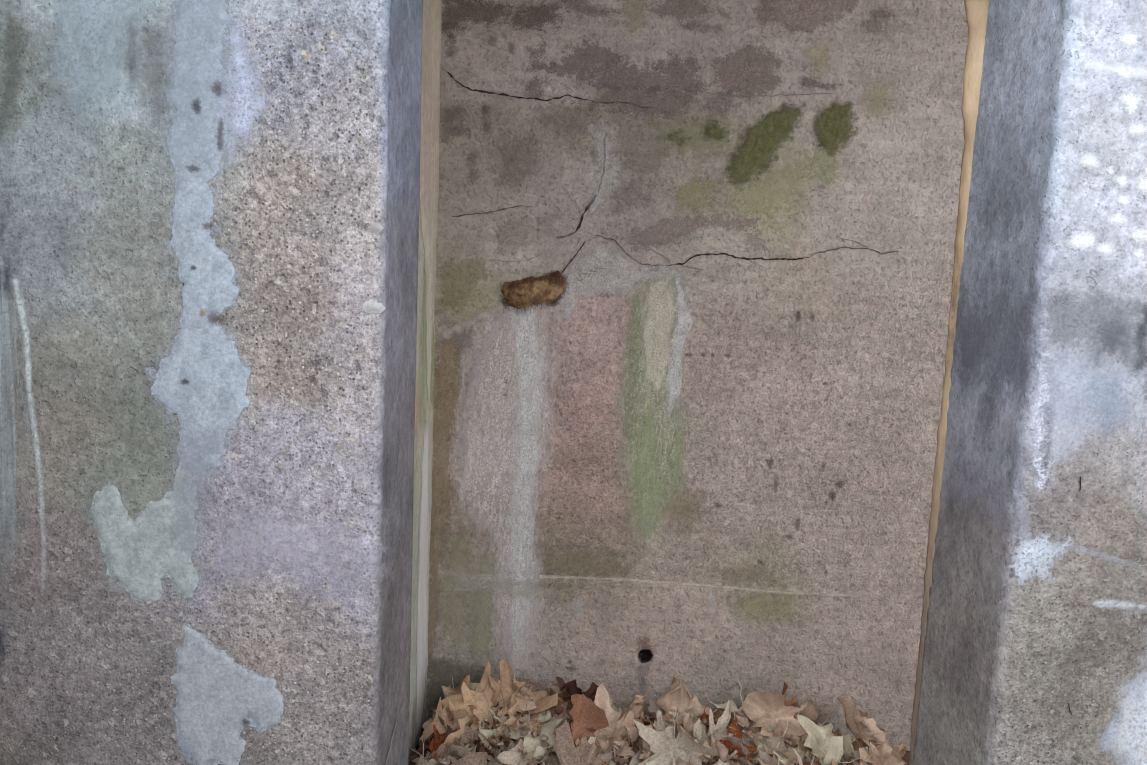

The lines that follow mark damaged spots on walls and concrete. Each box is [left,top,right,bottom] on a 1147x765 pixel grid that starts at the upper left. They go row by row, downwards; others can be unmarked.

crack [442,68,656,108]
crack [452,205,532,217]
damp [587,123,612,214]
crack [490,140,897,274]
damp [0,216,42,515]
peeling [83,0,252,604]
damp [960,295,1147,488]
damp [409,186,869,735]
damp [1010,508,1118,583]
damp [1093,599,1146,609]
peeling [170,625,284,765]
damp [1100,673,1147,765]